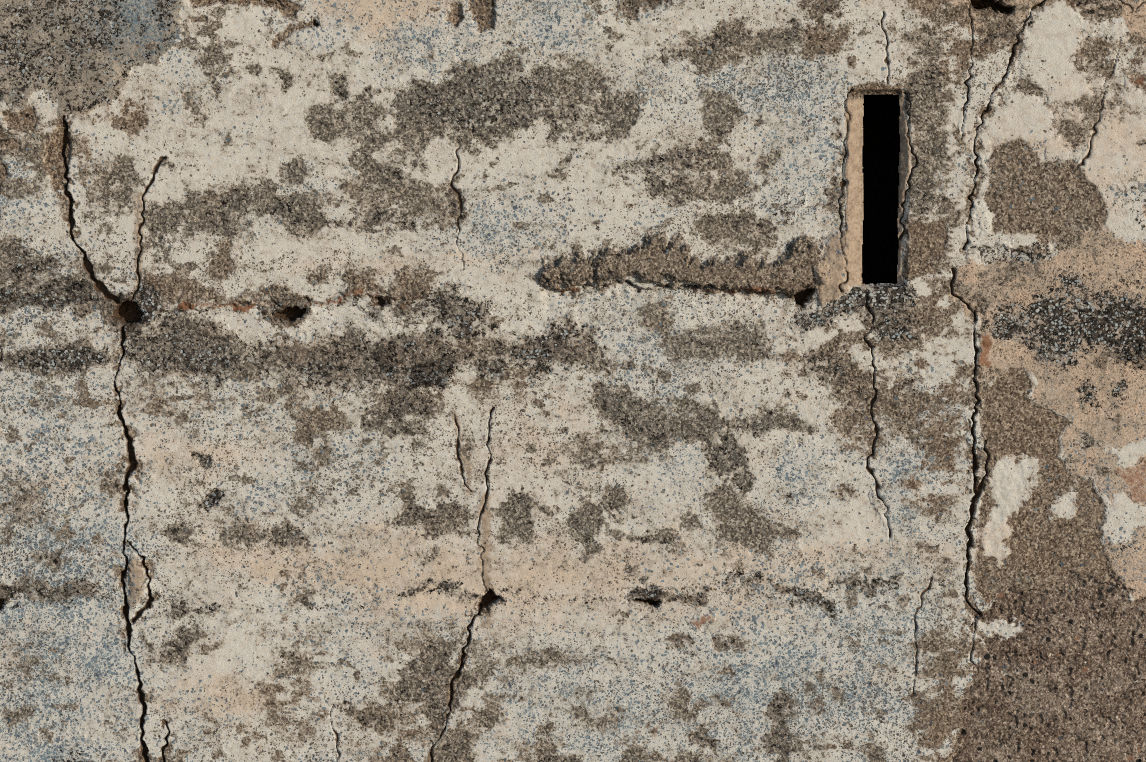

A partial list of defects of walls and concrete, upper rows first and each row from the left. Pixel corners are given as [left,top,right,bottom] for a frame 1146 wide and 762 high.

crack [879,11,919,241]
crack [1076,38,1121,169]
crack [1119,0,1146,14]
crack [60,115,170,762]
crack [429,407,495,762]
crack [837,88,892,540]
crack [908,576,934,699]
crack [950,0,1047,666]
spalling [892,0,1146,762]